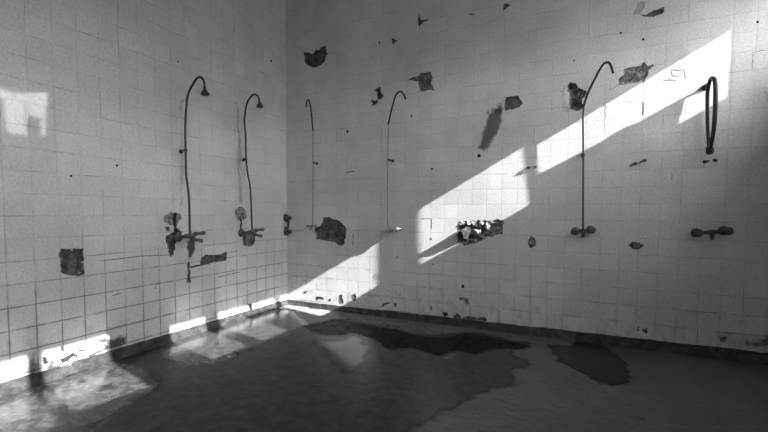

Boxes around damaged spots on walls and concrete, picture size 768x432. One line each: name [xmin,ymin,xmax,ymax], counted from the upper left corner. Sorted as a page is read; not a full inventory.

spalling [633,2,665,17]
spalling [304,46,328,68]
peeling [408,72,434,92]
spalling [618,61,654,85]
peeling [504,94,522,111]
spalling [567,82,587,111]
leakage [479,105,502,149]
spalling [164,212,181,256]
spalling [315,217,347,246]
spalling [457,219,504,245]
peeling [59,248,85,276]
spalling [191,251,227,268]